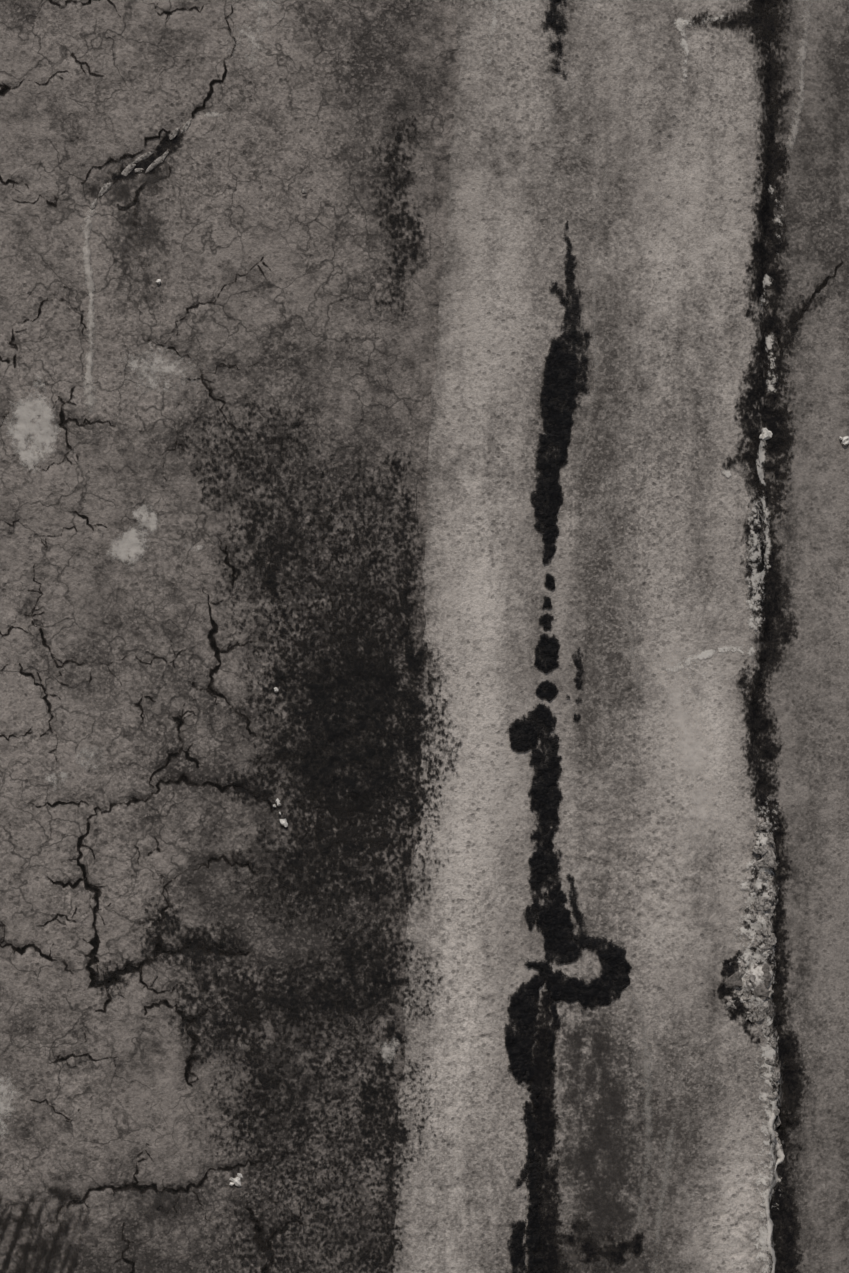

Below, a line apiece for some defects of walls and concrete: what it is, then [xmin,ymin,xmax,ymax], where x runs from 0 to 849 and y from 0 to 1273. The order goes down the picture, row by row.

crack [0,0,460,1273]
leakage [94,395,462,1273]
leakage [541,517,560,565]
leakage [549,281,566,304]
leakage [522,999,658,1273]
leakage [666,0,831,1273]